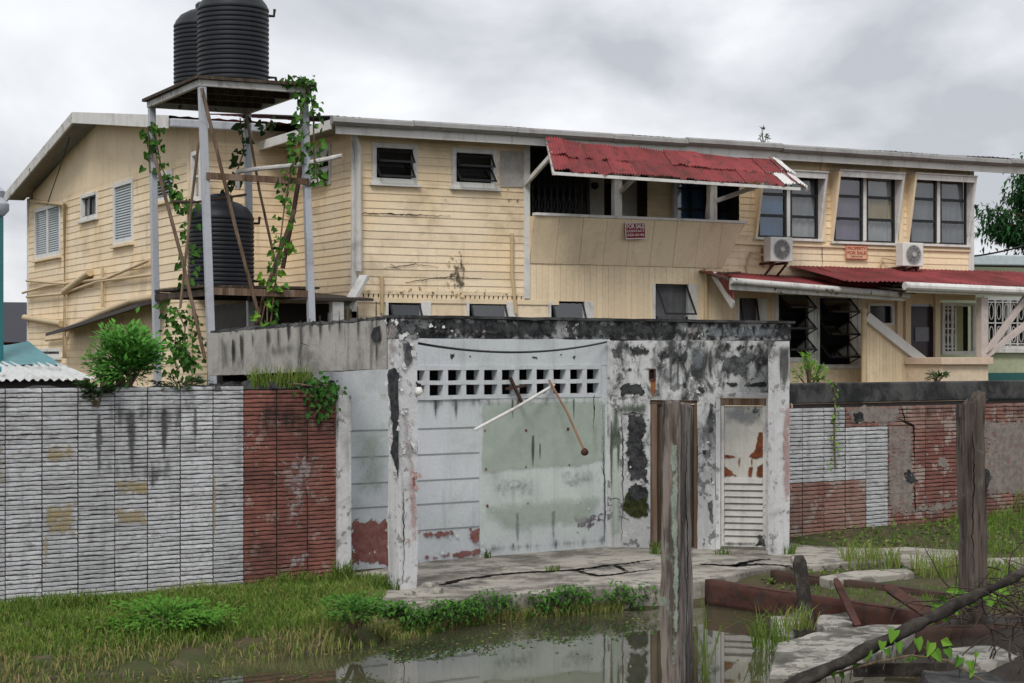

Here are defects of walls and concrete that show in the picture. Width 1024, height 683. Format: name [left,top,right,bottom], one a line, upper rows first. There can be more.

crack [362,210,442,218]
crack [388,263,477,283]
water stain [221,334,253,362]
mould [429,318,556,338]
water stain [118,410,134,464]
water stain [161,408,179,456]
peeling [210,316,484,566]
crack [439,409,656,585]
water stain [483,399,645,531]
flaking render [847,405,956,515]
crack [897,408,916,512]
flaking render [984,418,1024,496]